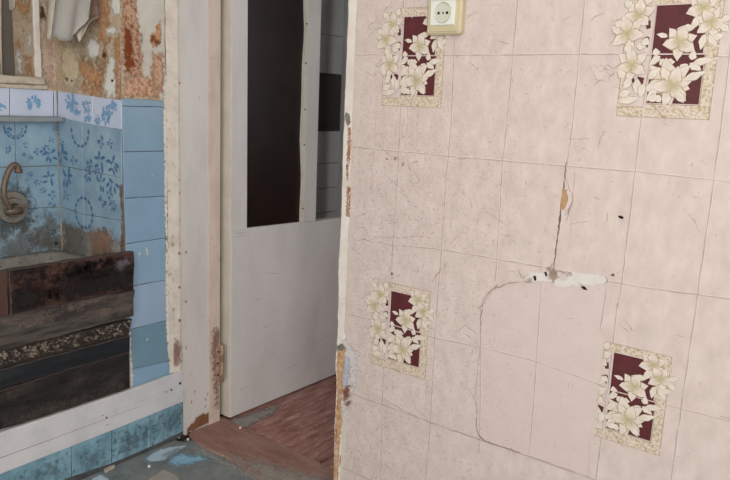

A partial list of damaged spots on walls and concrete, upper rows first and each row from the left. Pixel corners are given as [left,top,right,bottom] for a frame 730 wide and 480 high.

peeling [15,0,164,99]
damp [0,217,30,238]
crack [548,165,571,271]
peeling [525,271,553,282]
corrosion [212,329,220,404]
peeling [187,393,209,433]
spalling [330,340,359,480]